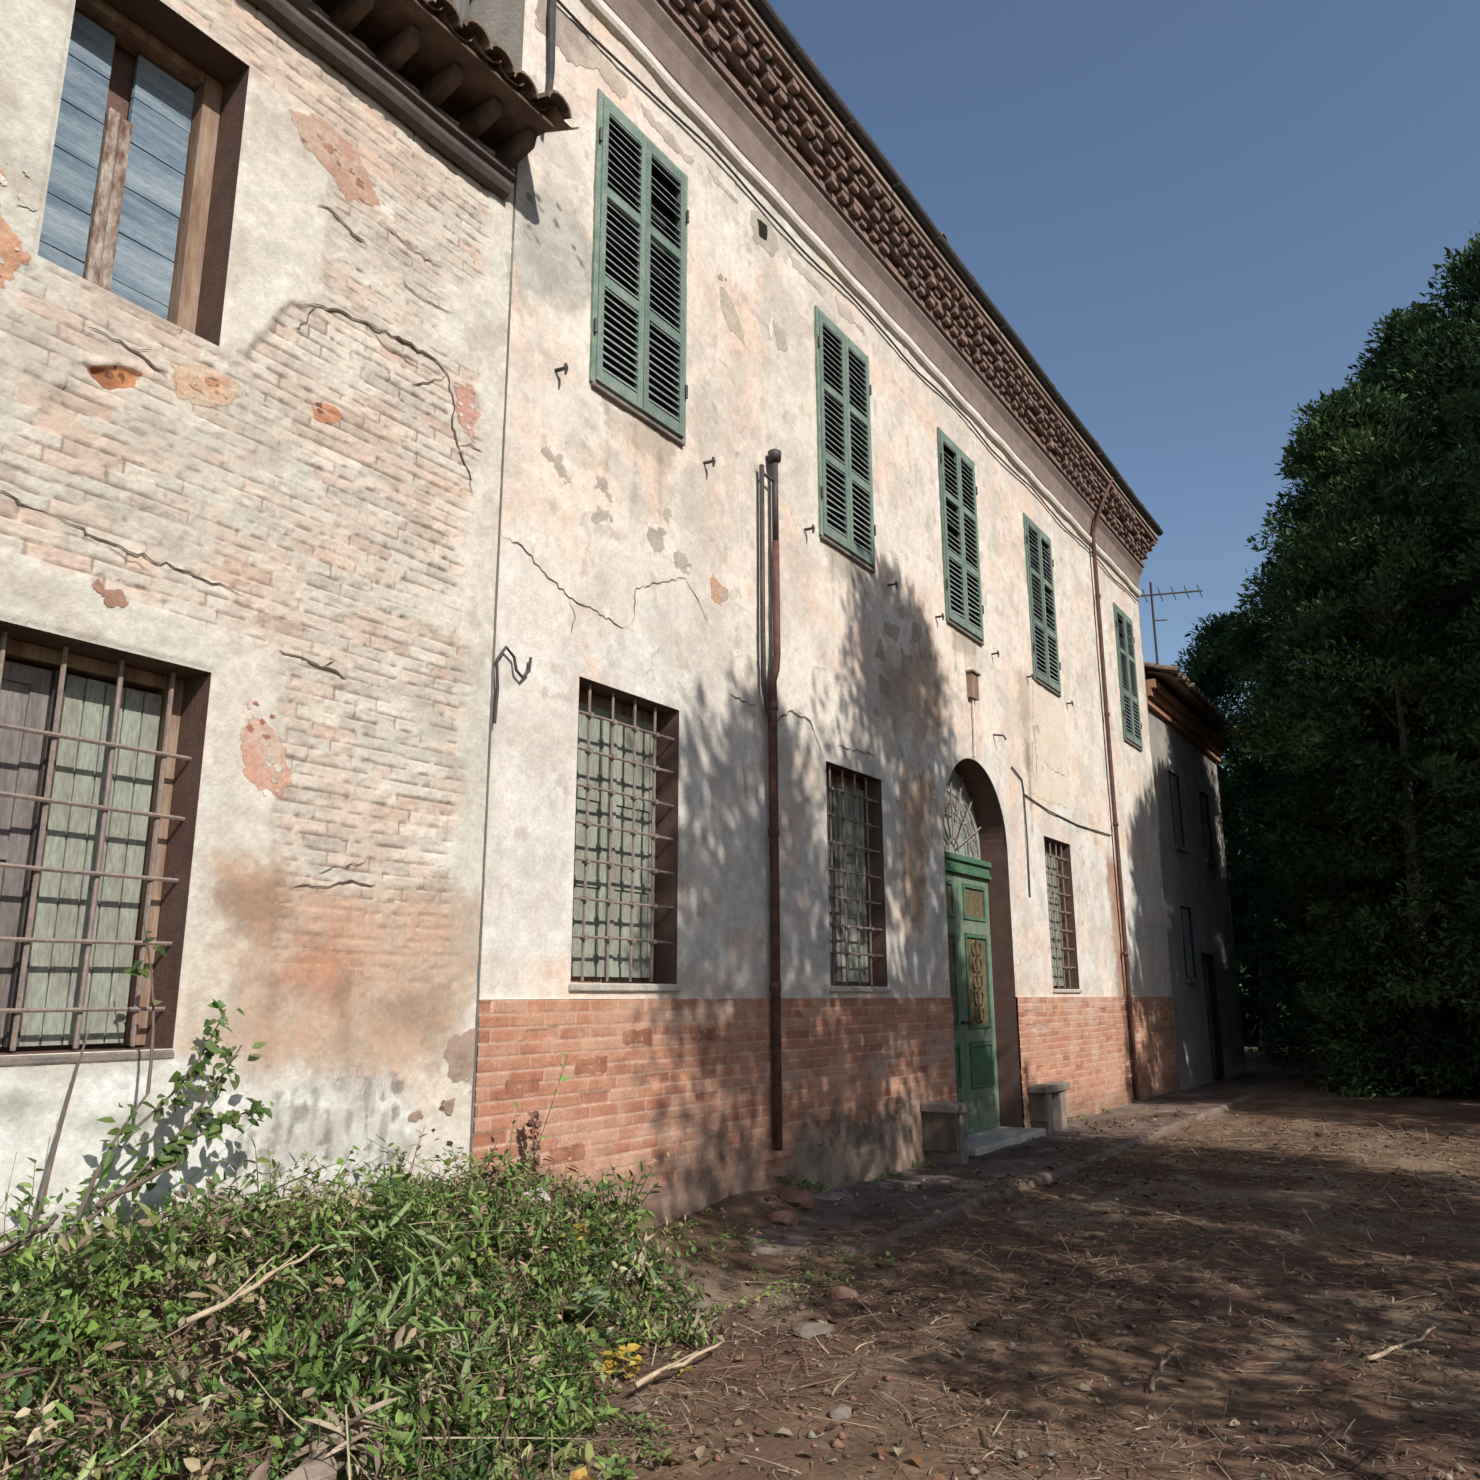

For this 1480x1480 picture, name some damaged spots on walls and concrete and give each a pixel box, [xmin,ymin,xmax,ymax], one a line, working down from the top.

spalling [289,109,380,206]
flaking render [0,213,31,288]
spalling [87,365,142,389]
flaking render [171,363,247,408]
spalling [312,402,343,425]
crack [297,303,482,490]
spalling [454,382,481,442]
peeling [92,578,129,607]
crack [0,490,262,605]
crack [510,539,708,634]
flaking render [240,701,292,799]
leakage [0,859,477,1234]